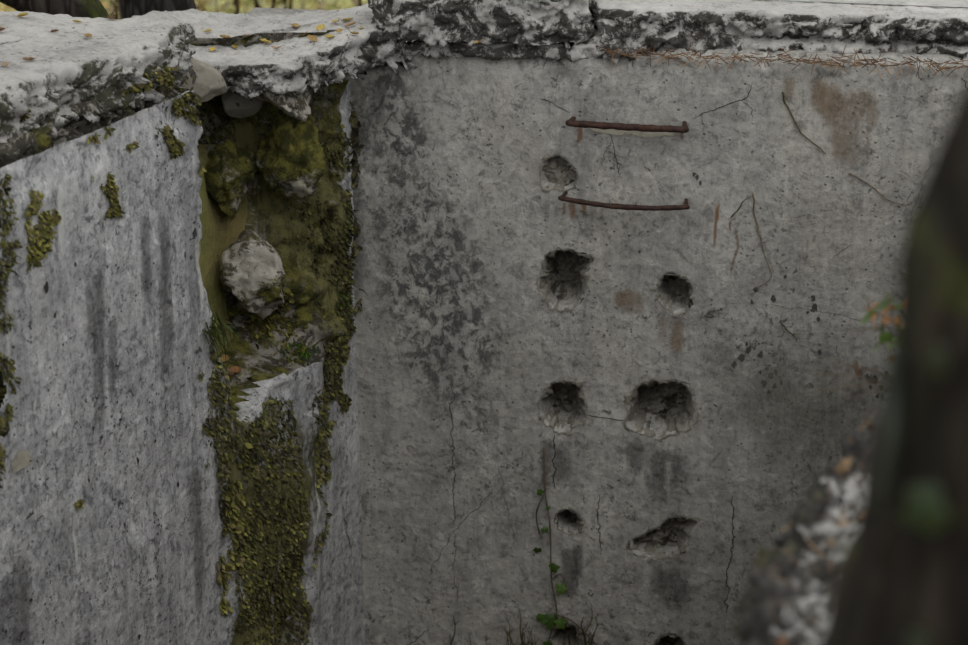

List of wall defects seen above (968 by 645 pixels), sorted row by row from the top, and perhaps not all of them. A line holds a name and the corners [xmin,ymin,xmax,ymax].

spalling [539,153,579,192]
spalling [536,247,595,313]
spalling [650,273,696,318]
spalling [537,380,588,436]
spalling [623,378,700,441]
spalling [553,506,585,535]
spalling [626,516,700,561]